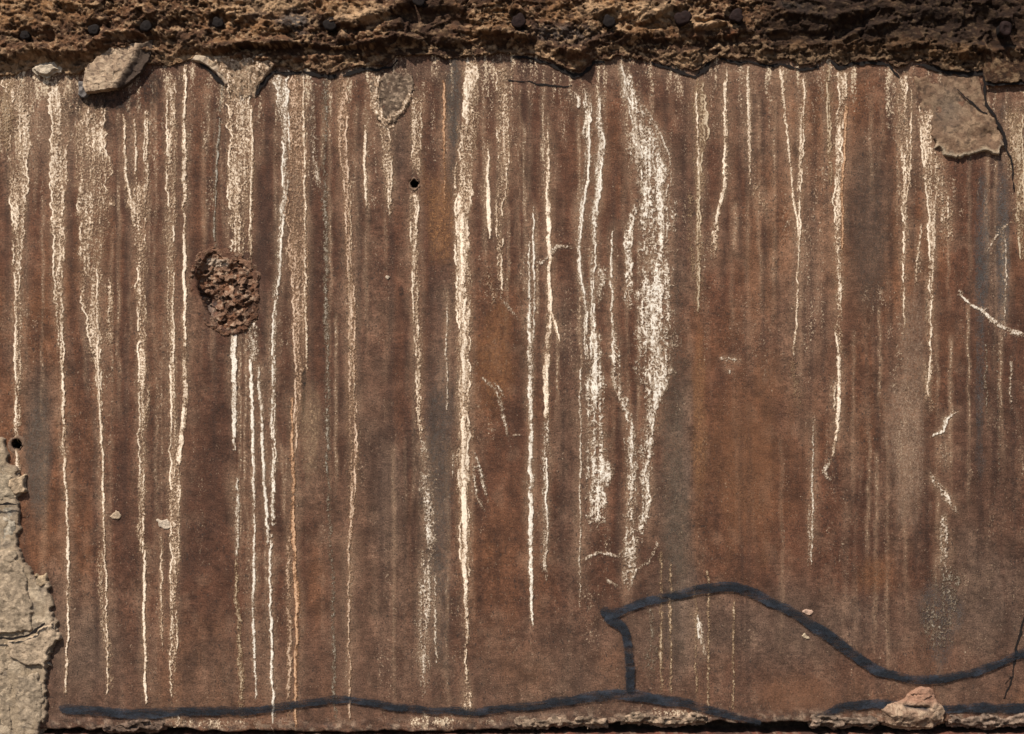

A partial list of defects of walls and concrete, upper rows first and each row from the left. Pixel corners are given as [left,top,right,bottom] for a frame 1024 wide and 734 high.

spalling [32,62,62,79]
leakage [0,65,189,727]
peeling [78,40,154,99]
leakage [211,79,255,255]
leakage [229,68,395,729]
leakage [400,56,730,710]
efflorescence [778,65,807,404]
efflorescence [807,64,848,565]
crack [651,58,1024,190]
efflorescence [896,70,953,411]
spalling [0,437,63,734]
crack [1003,618,1024,699]